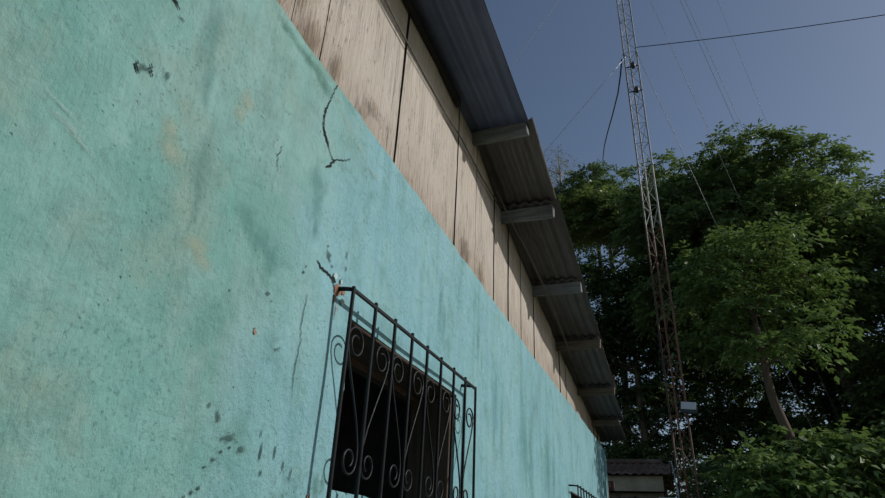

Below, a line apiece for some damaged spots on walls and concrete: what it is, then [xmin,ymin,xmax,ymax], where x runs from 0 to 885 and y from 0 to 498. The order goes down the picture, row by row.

crack [323,85,351,167]